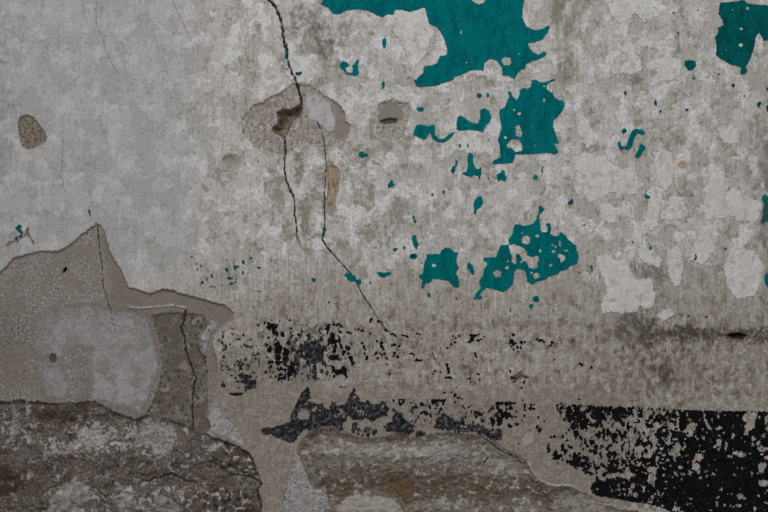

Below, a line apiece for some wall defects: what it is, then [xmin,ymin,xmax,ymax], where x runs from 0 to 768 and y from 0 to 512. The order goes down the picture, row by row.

crack [267,0,303,105]
peeling [321,0,550,87]
peeling [715,0,768,75]
spalling [18,114,47,150]
spalling [241,43,351,208]
peeling [376,79,565,182]
crack [284,136,301,248]
crack [317,122,395,336]
peeling [473,196,483,214]
crack [180,310,207,433]
spalling [0,206,768,512]